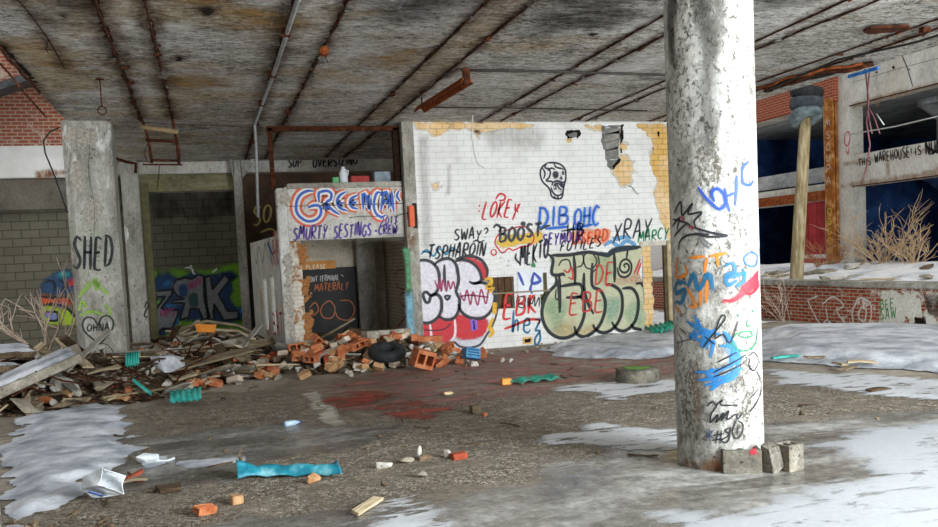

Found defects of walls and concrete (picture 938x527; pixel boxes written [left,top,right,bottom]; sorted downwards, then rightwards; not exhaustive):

spalling [754,0,887,51]
rust [863,24,931,37]
spalling [325,0,539,158]
peeling [413,15,664,140]
spalling [565,81,666,188]
spalling [297,243,310,266]
spalling [300,276,314,341]
peeling [880,290,938,324]